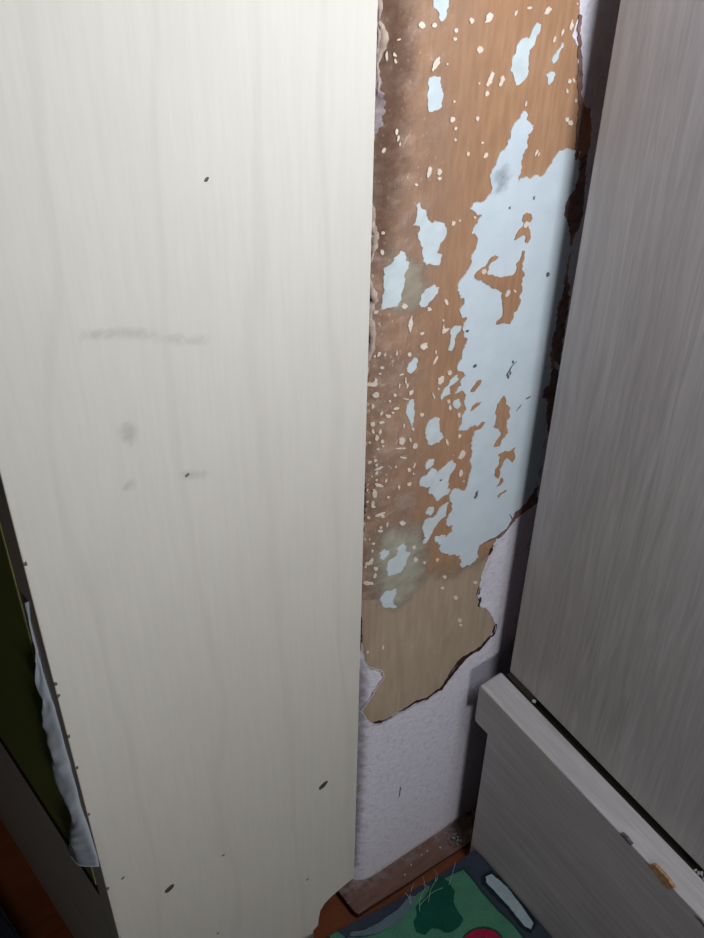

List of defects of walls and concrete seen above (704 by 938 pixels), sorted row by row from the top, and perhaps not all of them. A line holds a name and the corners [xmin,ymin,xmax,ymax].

flaking render [376,0,401,65]
flaking render [418,0,449,29]
flaking render [427,56,456,112]
flaking render [478,6,552,97]
flaking render [546,19,574,85]
flaking render [362,101,588,585]
flaking render [380,589,397,608]